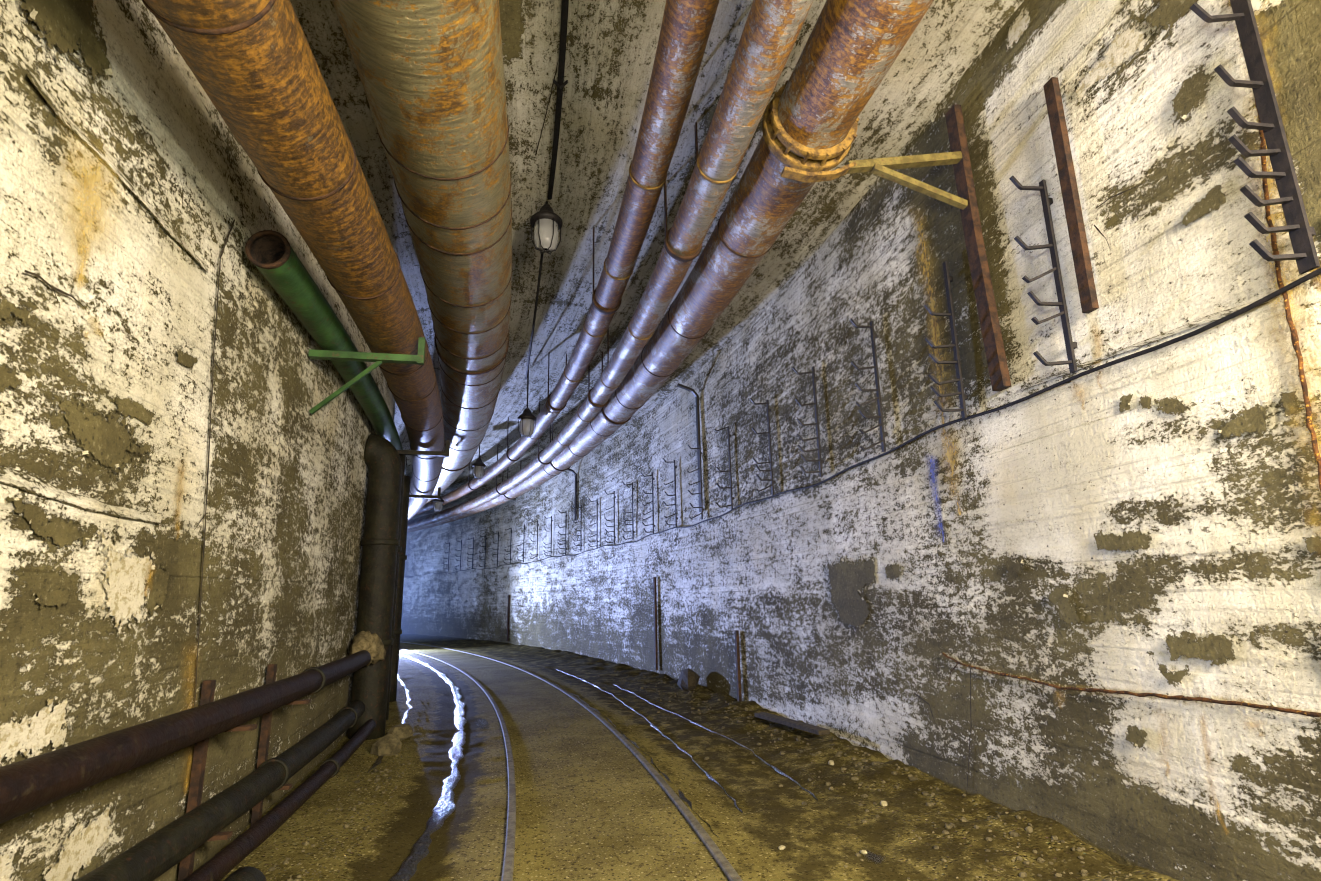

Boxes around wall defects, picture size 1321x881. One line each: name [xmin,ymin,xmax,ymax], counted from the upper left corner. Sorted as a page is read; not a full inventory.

peeling [19,0,116,81]
peeling [1168,61,1216,127]
peeling [1180,185,1226,226]
peeling [176,349,198,370]
peeling [51,393,156,479]
peeling [1119,394,1191,416]
peeling [1219,391,1300,440]
peeling [6,496,91,550]
peeling [1093,529,1152,553]
peeling [825,555,901,631]
peeling [1146,631,1236,687]
peeling [1125,725,1147,752]